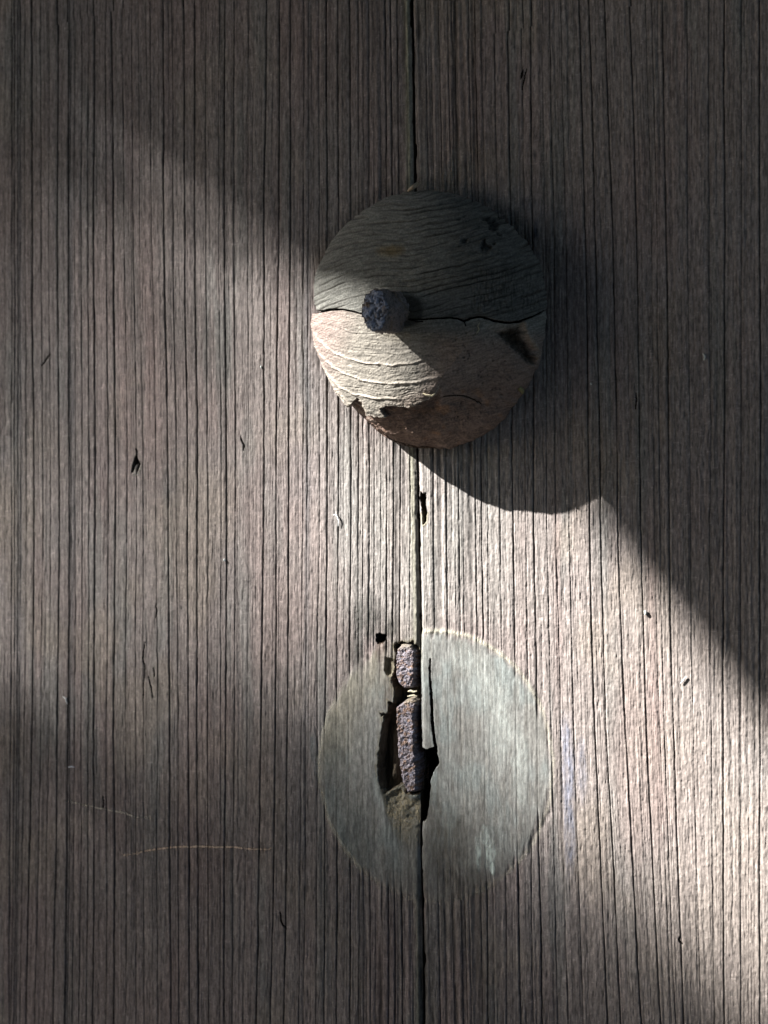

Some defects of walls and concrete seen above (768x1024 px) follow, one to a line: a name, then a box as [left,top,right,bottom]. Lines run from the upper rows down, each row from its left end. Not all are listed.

crack [314,307,362,315]
crack [408,311,543,326]
spalling [376,640,426,795]
rust [396,694,430,792]